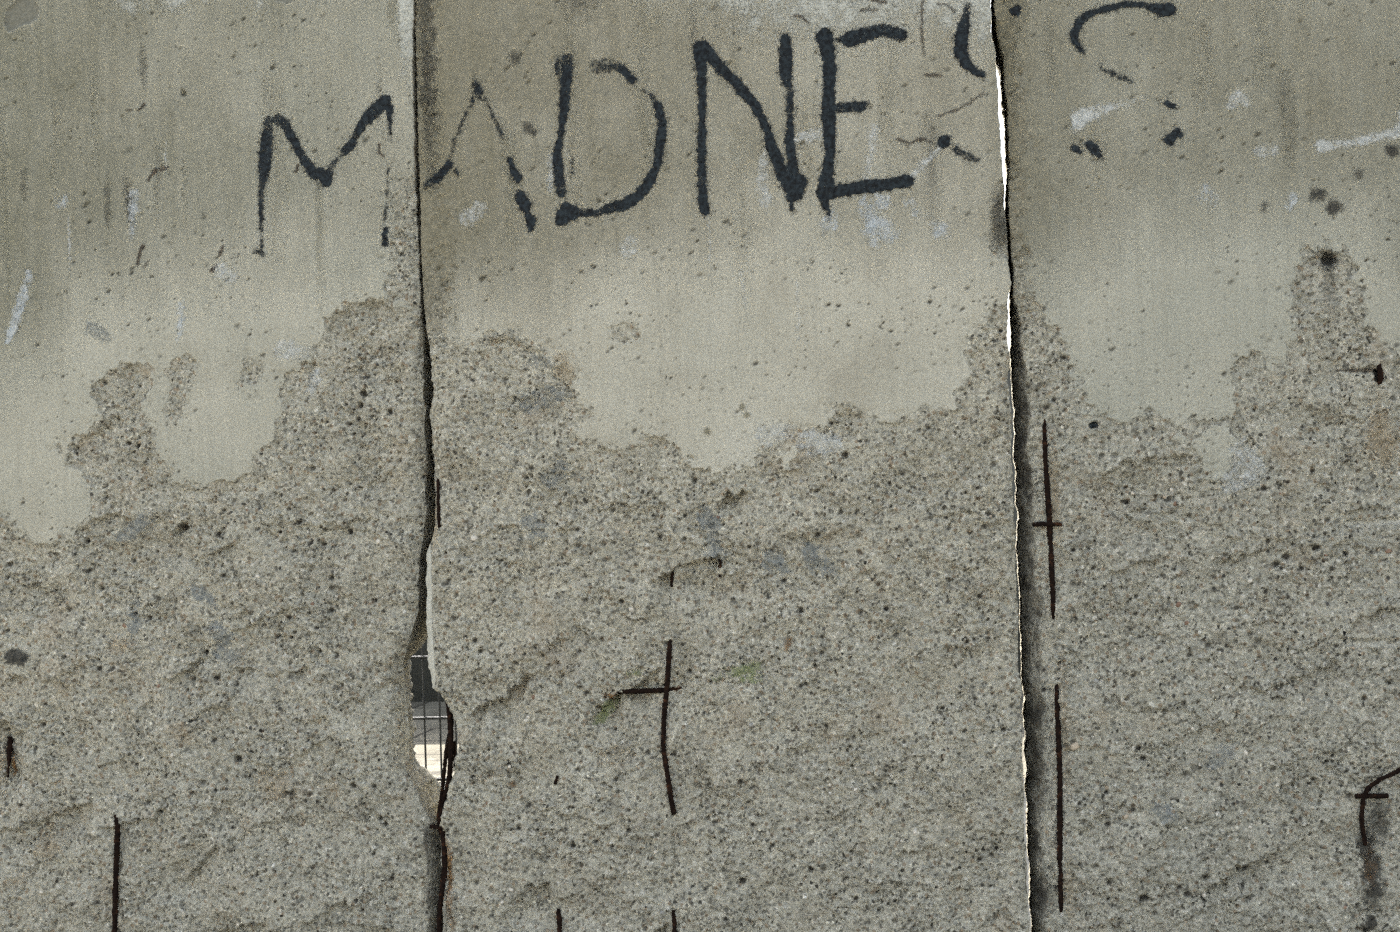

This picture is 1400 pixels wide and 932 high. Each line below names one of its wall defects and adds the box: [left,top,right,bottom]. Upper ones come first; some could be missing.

spalling [0,175,1030,932]
spalling [989,164,1400,932]
rust [1357,808,1386,931]